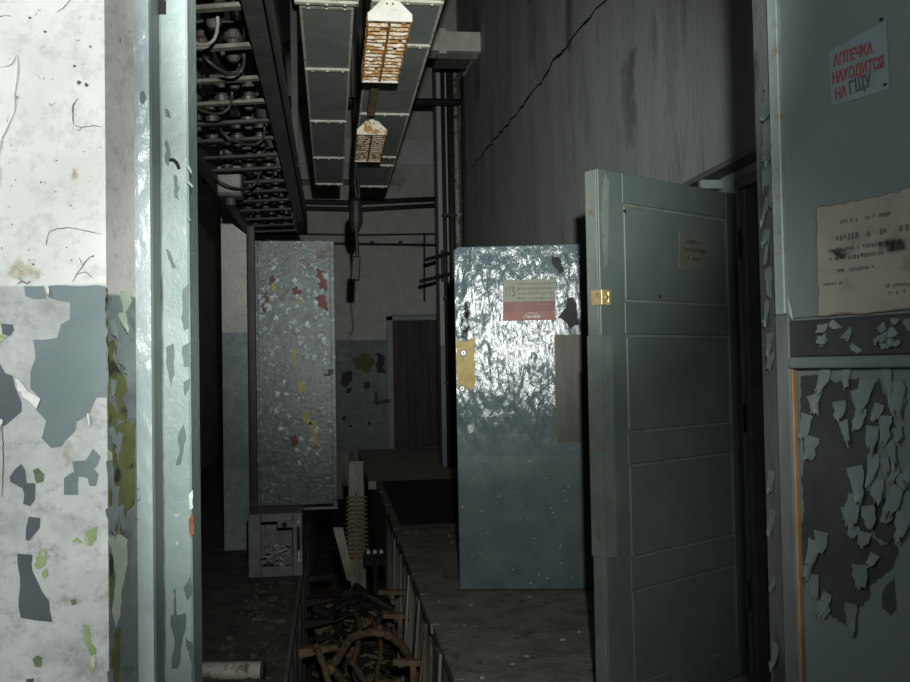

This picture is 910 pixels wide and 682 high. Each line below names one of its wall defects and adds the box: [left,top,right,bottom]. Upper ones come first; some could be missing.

crack [72,99,101,128]
crack [467,0,607,172]
peeling [815,319,862,353]
peeling [873,318,910,349]
peeling [0,285,136,682]
peeling [797,368,910,638]